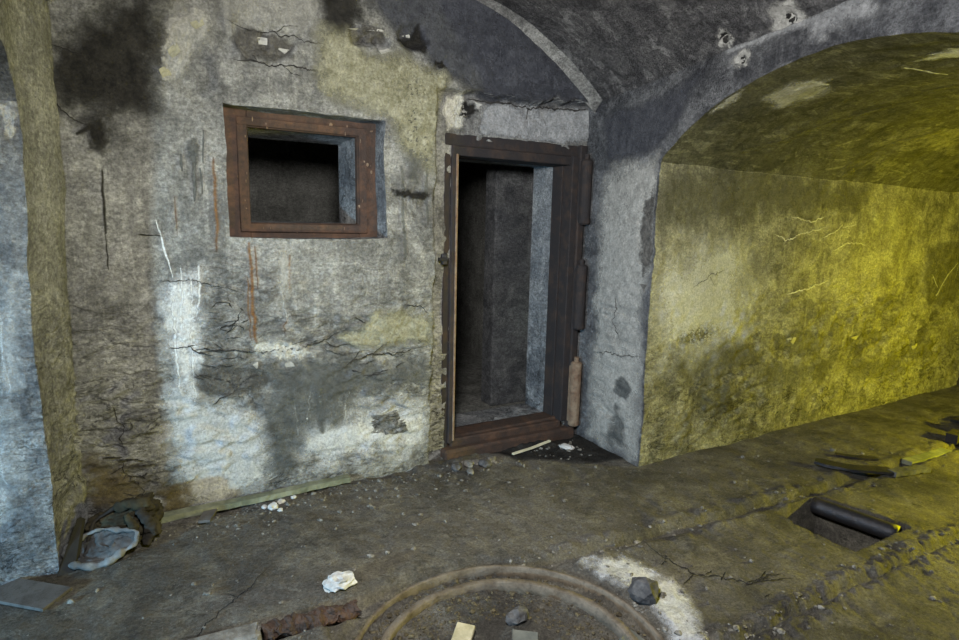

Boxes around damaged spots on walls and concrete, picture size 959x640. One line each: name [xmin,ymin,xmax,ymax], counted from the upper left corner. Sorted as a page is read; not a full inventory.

spalling [233,29,294,61]
crack [160,279,423,405]